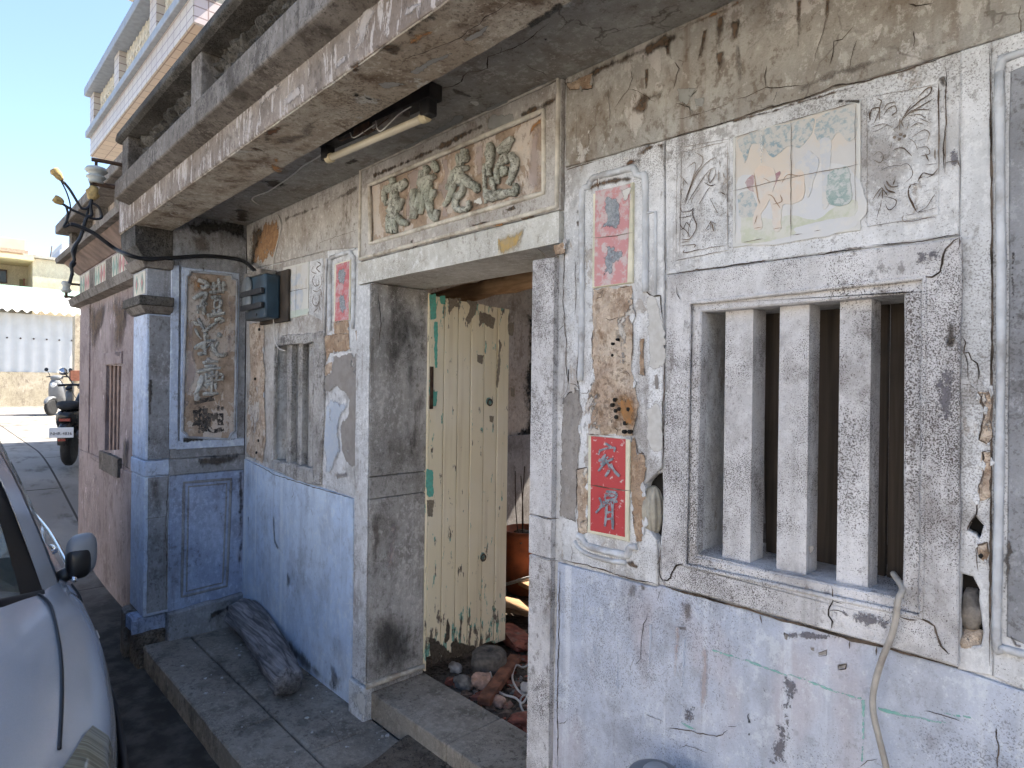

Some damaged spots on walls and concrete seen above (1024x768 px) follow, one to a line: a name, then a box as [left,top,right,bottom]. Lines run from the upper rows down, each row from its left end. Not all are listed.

crack [406,3,546,88]
crack [564,3,960,193]
flaking render [324,321,357,377]
peeling [429,294,495,368]
peeling [323,400,345,472]
flaking render [559,285,666,543]
crack [641,361,665,461]
flaking render [972,385,995,505]
peeling [426,469,434,517]
peeling [428,619,475,665]
crack [539,547,958,768]
water stain [768,676,798,764]